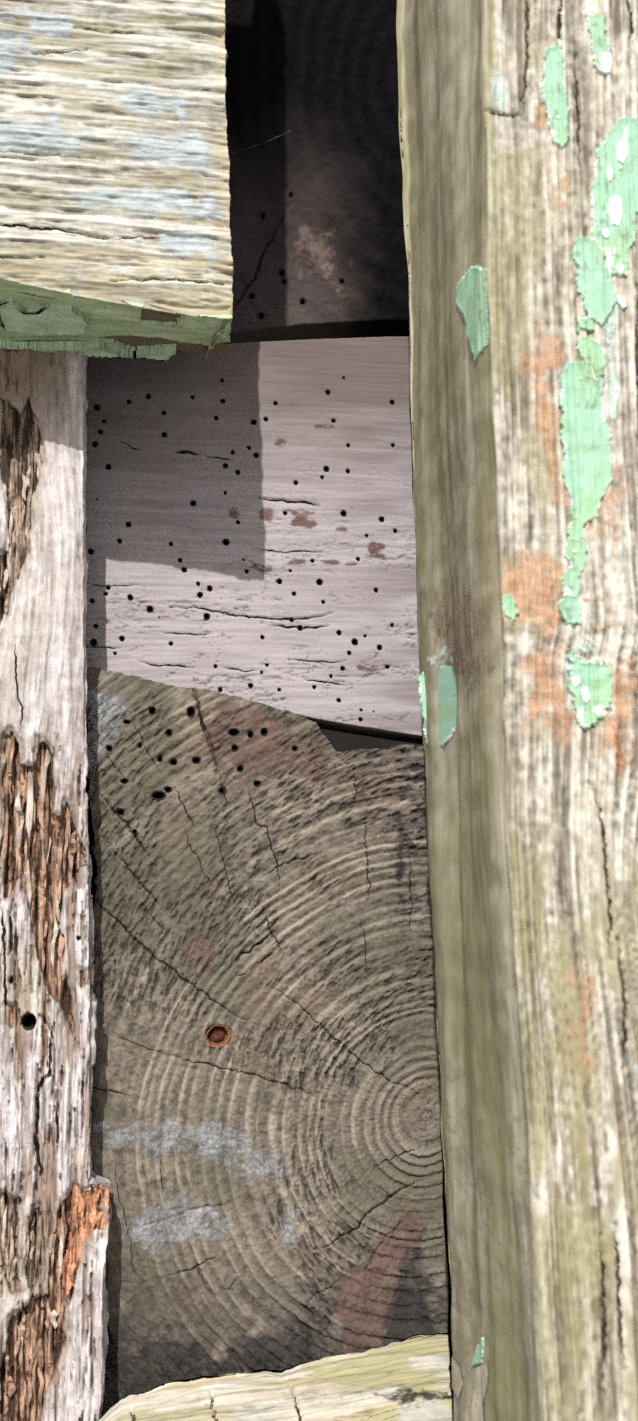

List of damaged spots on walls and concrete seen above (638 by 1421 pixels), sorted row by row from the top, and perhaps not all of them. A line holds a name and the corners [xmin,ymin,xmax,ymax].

peeling [584,13,612,76]
peeling [541,44,570,149]
crack [113,203,291,308]
peeling [0,278,233,362]
peeling [456,266,490,362]
peeling [557,115,638,731]
crack [289,1385,302,1421]